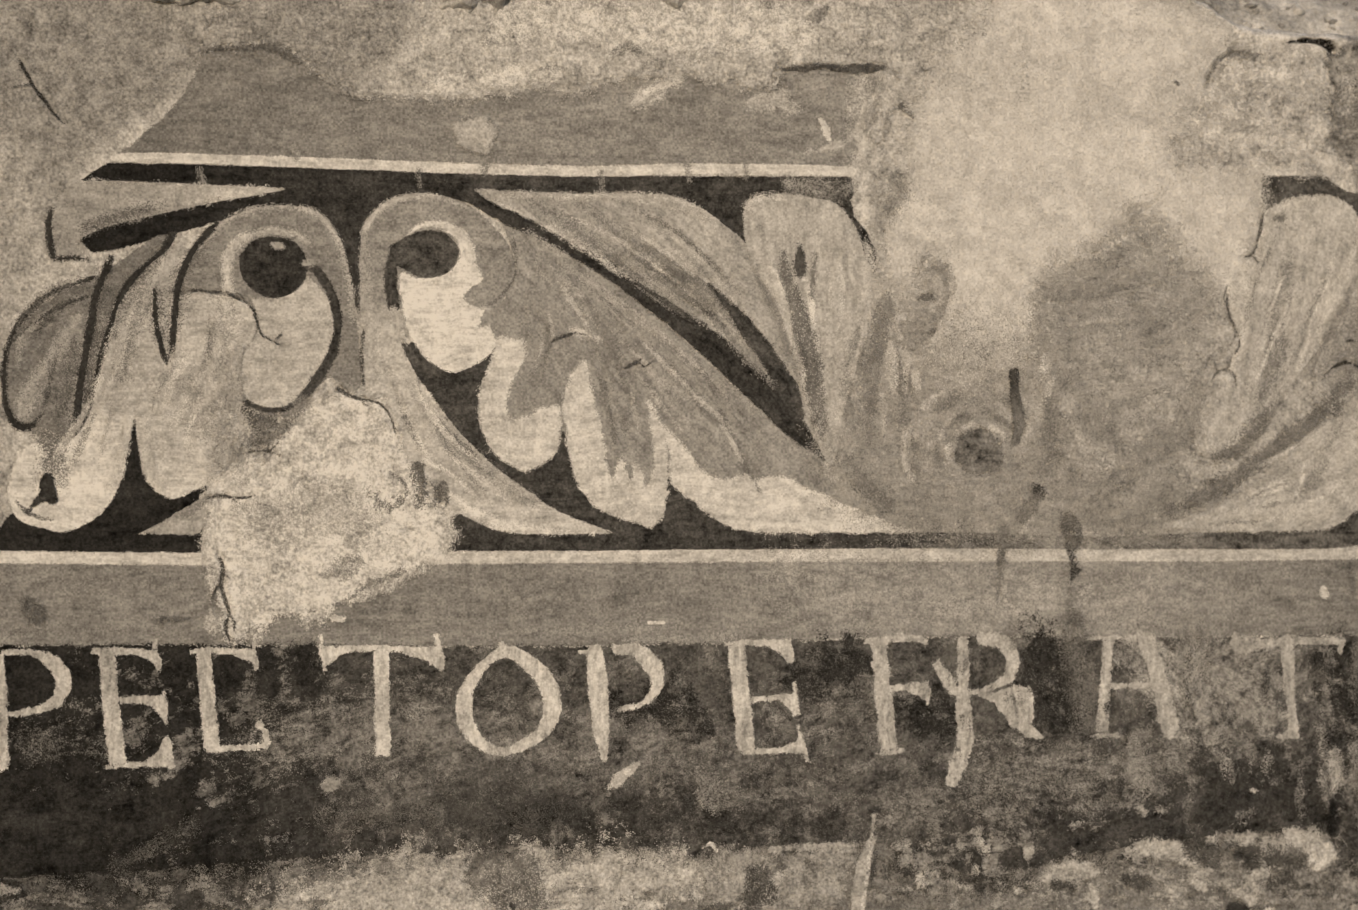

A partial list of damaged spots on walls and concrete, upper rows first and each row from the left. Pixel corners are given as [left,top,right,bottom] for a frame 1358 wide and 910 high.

crack [212,557,236,641]
spalling [196,344,464,652]
water stain [990,185,1275,833]
peeling [0,774,1358,910]